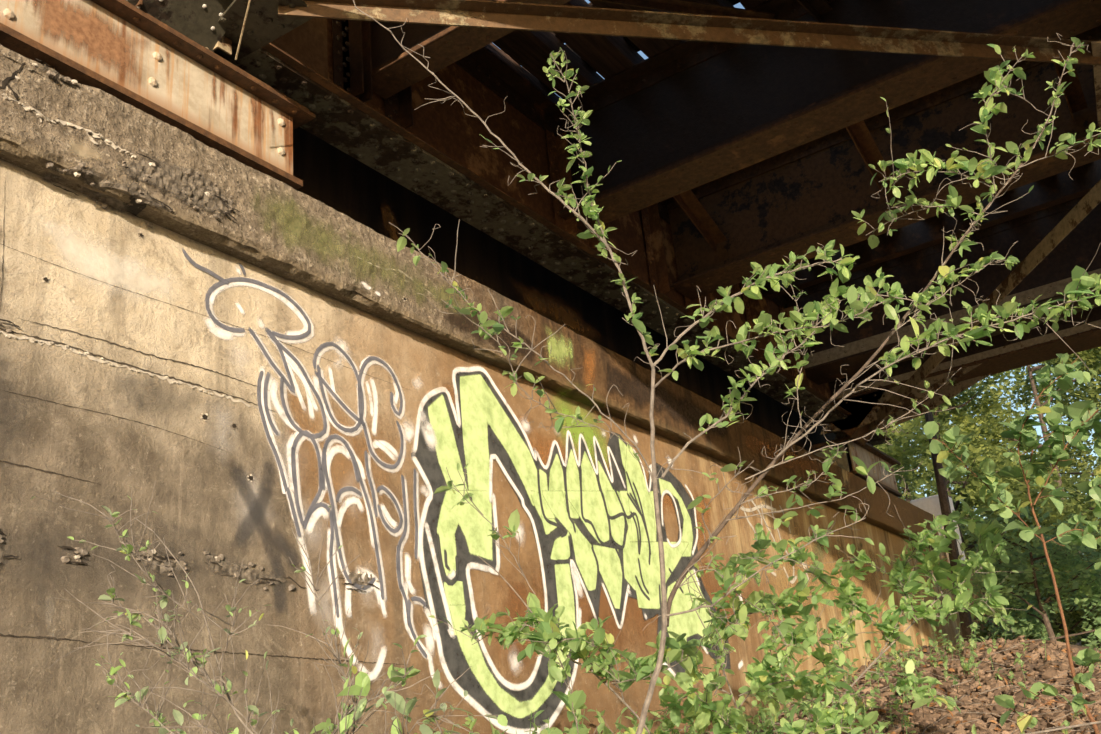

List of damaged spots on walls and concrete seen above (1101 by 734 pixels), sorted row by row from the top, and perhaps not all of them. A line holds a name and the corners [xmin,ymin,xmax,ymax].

rust [34,0,143,81]
crack [0,62,136,159]
crack [0,207,413,412]
damp [265,200,534,362]
rust [523,291,591,335]
damp [548,338,572,362]
crack [0,389,232,454]
crack [0,633,404,665]